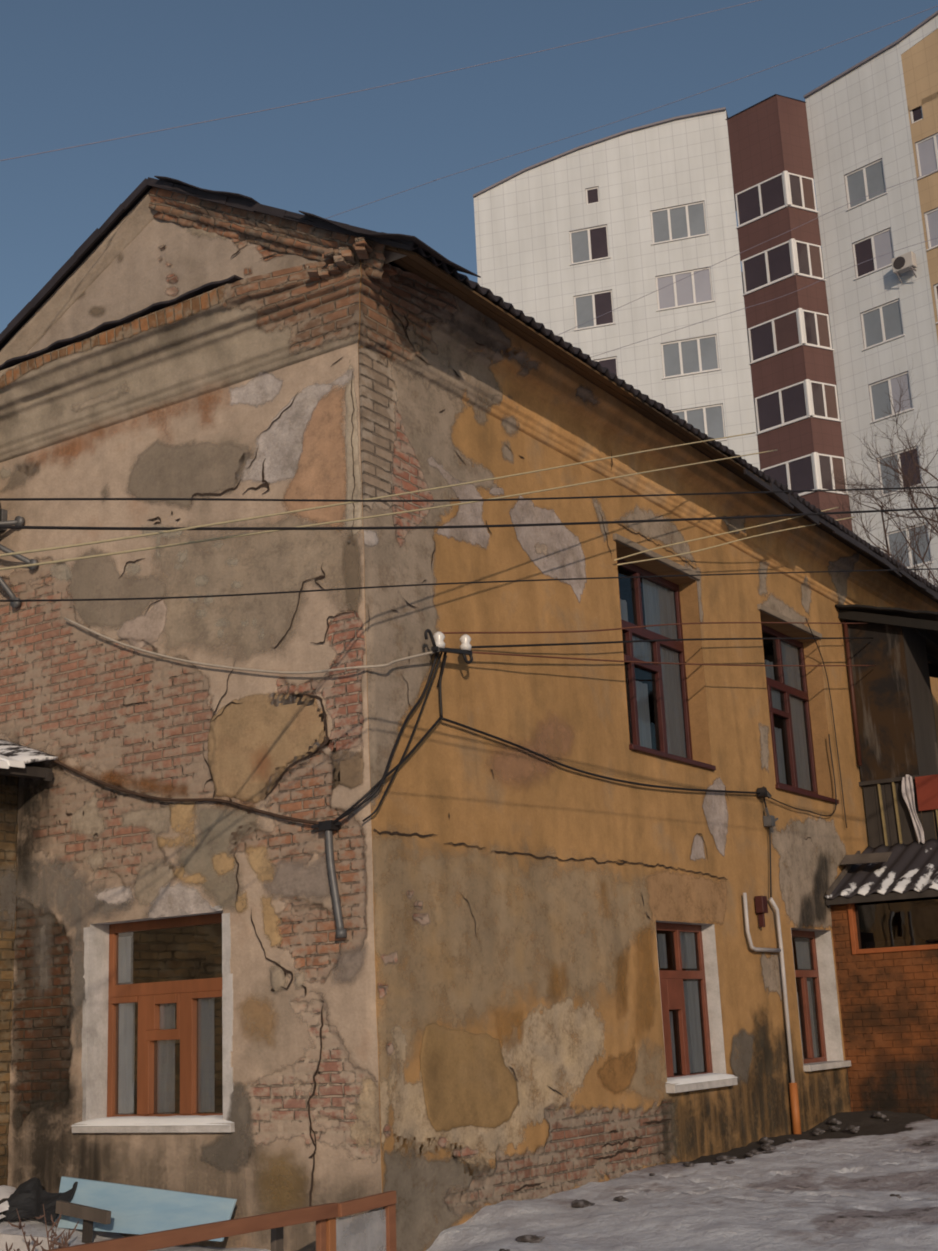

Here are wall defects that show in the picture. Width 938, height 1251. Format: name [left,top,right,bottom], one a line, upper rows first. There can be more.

crack [149,394,297,524]
crack [203,754,232,801]
crack [210,659,240,721]
crack [265,694,329,798]
peeling [0,225,728,1215]
crack [374,814,728,919]
crack [233,846,323,1206]
leakage [662,1018,938,1161]